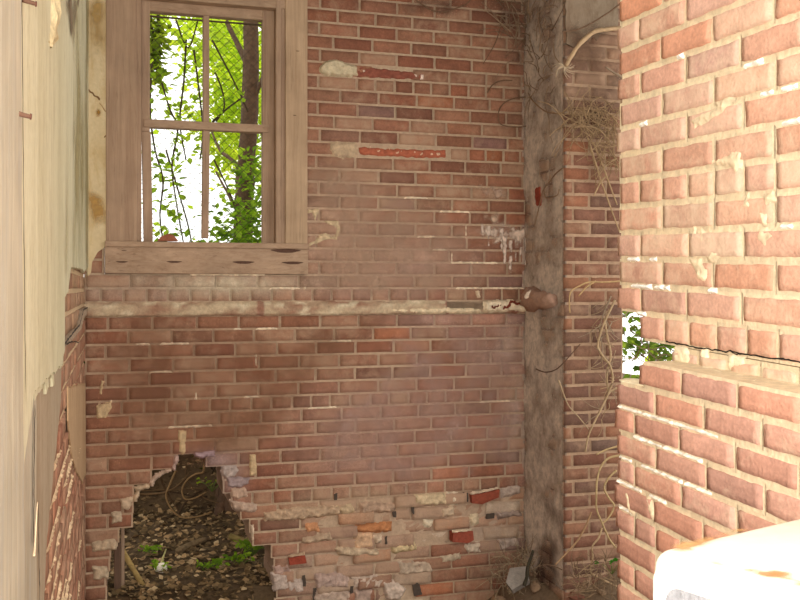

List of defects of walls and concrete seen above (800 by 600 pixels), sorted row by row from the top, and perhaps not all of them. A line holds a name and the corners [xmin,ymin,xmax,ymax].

leakage [481,216,526,288]
peeling [21,0,89,600]
crack [666,341,800,363]
spalling [111,455,179,524]
spalling [500,485,521,498]
spalling [411,491,468,517]
spalling [468,508,522,526]
spalling [220,465,434,600]
spalling [91,538,118,552]
spalling [439,541,481,562]
spalling [92,566,109,580]